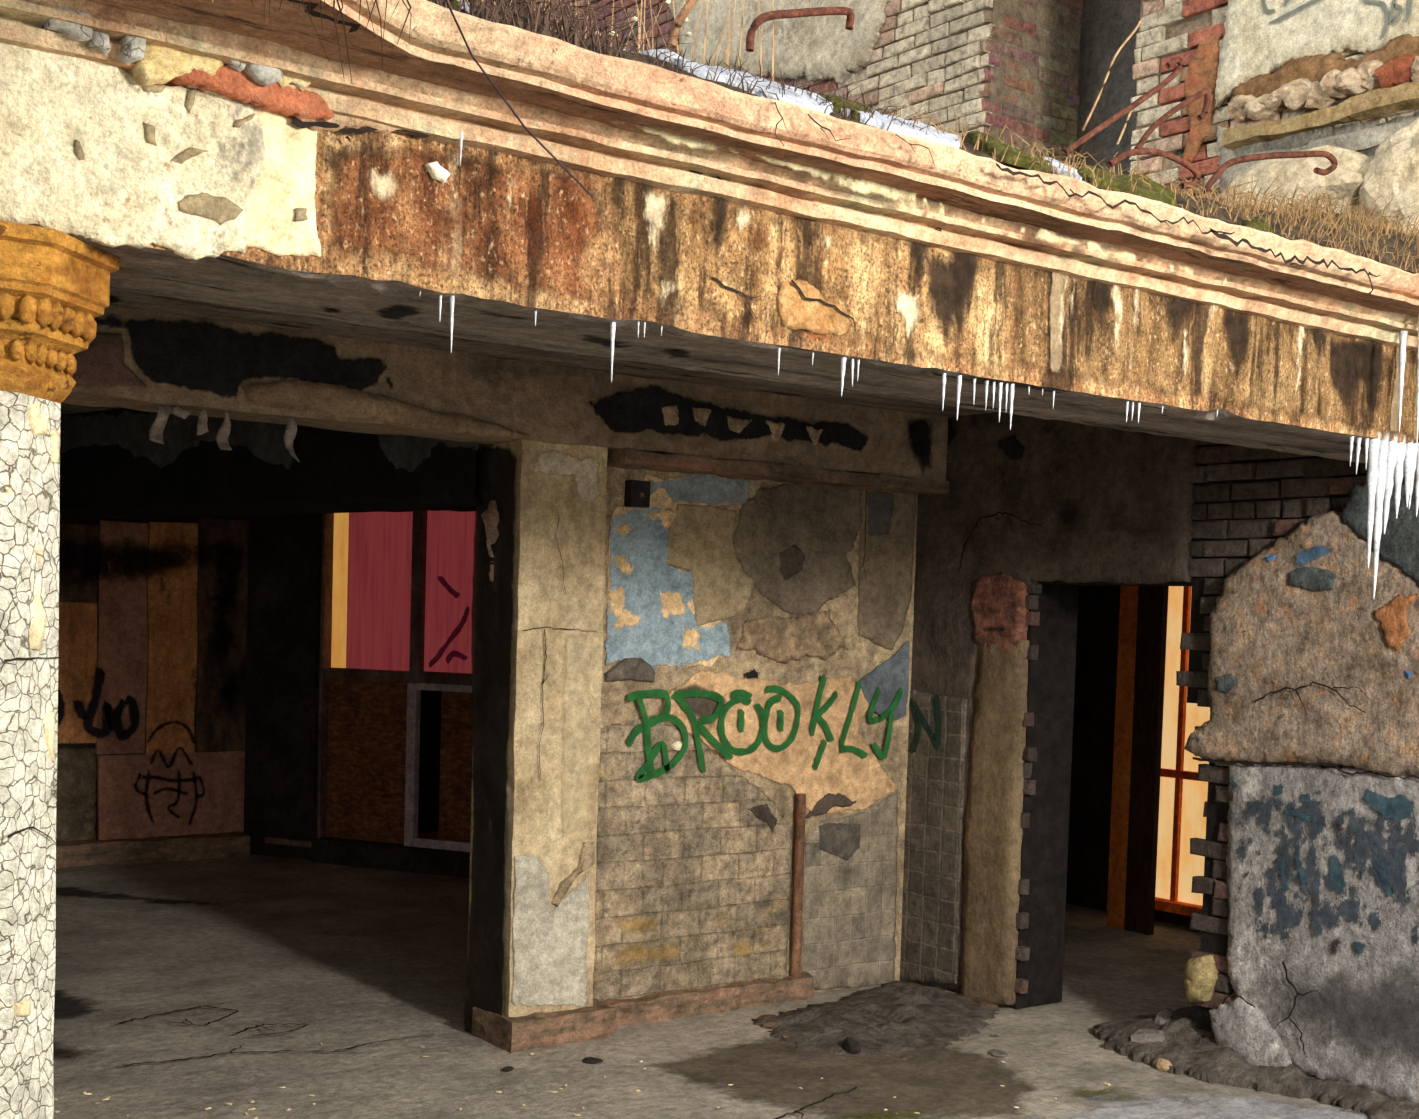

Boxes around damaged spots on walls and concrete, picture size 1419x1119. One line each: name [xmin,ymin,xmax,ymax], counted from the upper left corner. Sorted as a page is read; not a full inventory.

spalling [41,8,334,128]
damp [760,155,944,214]
rust [327,148,1419,440]
damp [1021,228,1136,261]
crack [996,162,1381,295]
peeling [27,313,530,473]
crack [4,655,60,663]
peeling [604,474,910,860]
crack [8,812,56,843]
peeling [1230,776,1419,953]
damp [54,990,96,1018]
damp [650,1039,1033,1119]